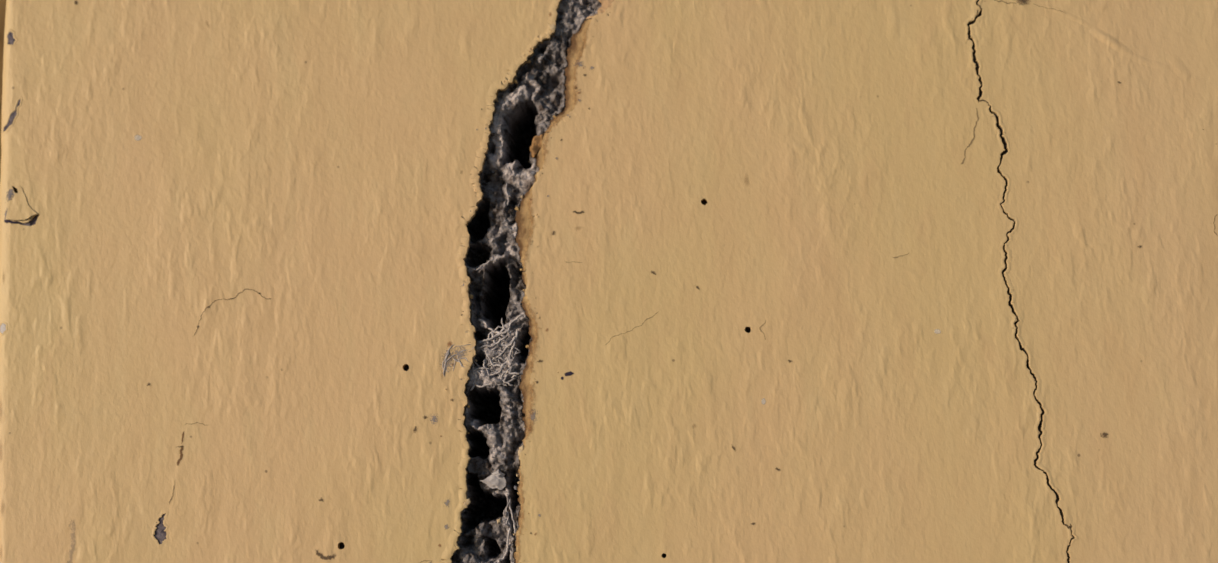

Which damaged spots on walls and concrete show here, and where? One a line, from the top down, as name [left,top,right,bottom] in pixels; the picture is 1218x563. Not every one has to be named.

peeling [5,29,18,47]
peeling [1,96,23,135]
peeling [4,185,39,226]
crack [962,0,1078,563]
spalling [440,342,474,375]
peeling [151,510,170,547]